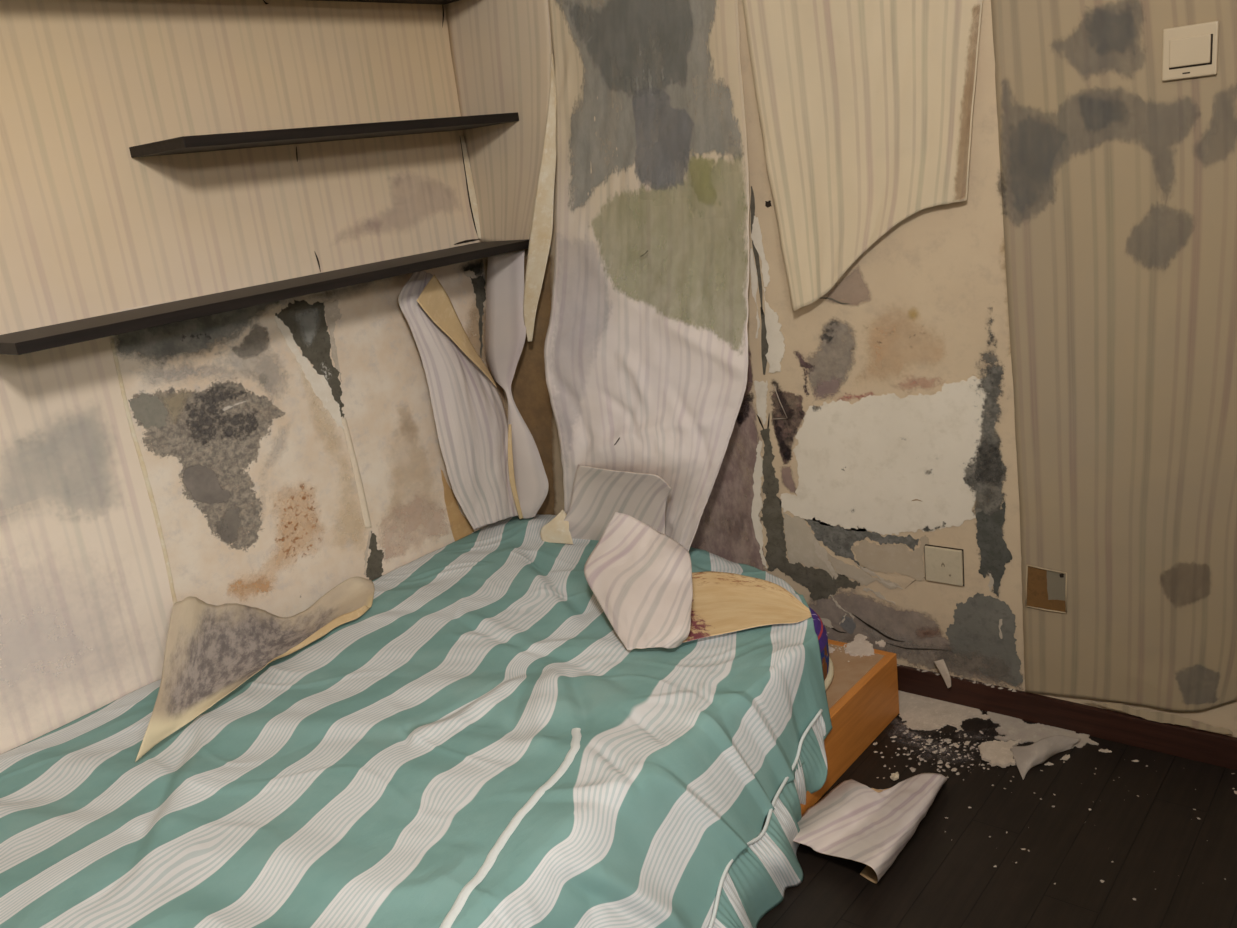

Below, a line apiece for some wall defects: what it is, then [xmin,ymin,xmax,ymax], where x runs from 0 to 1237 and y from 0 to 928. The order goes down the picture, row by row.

leakage [115,301,285,552]
peeling [109,258,508,617]
peeling [780,376,995,604]
peeling [828,634,886,656]
spalling [941,564,1067,687]